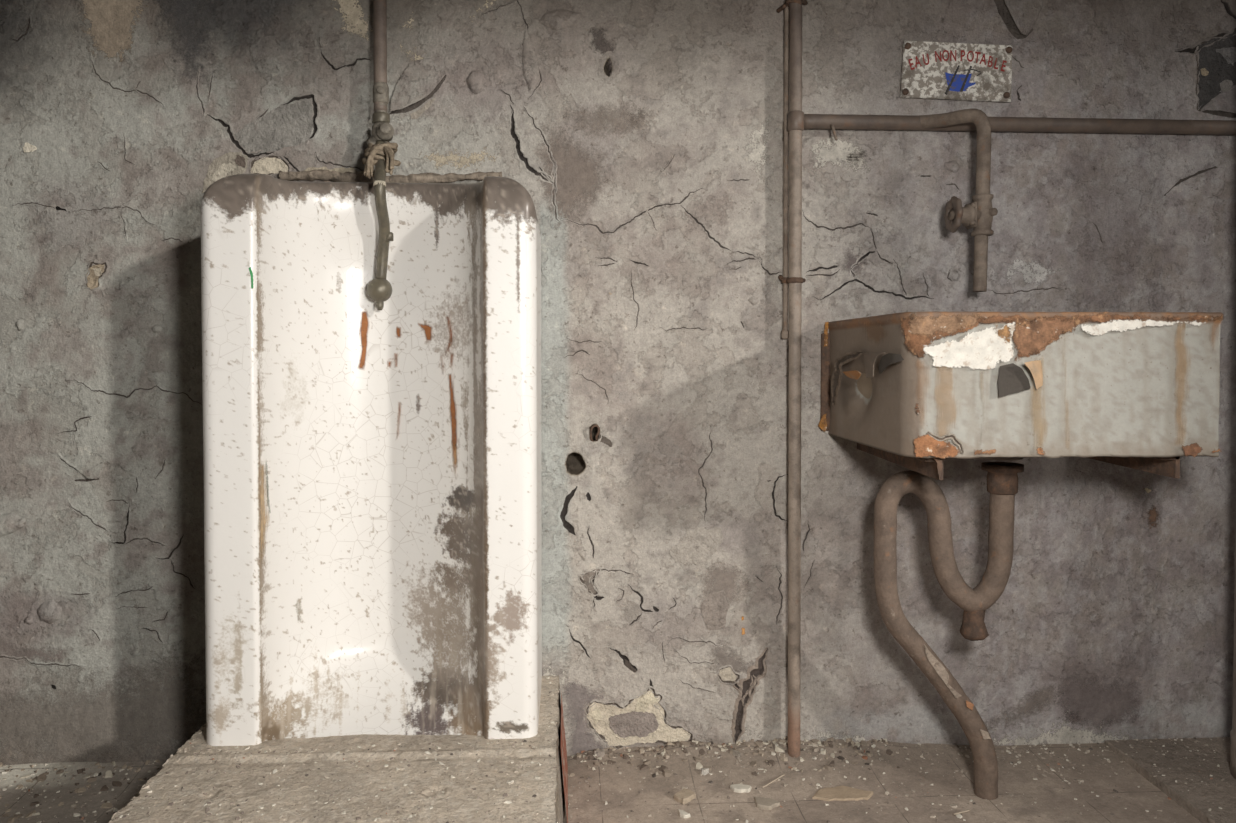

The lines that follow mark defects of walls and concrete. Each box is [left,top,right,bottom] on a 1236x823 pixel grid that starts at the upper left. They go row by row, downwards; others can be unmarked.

peeling [78,0,148,62]
peeling [331,0,373,41]
crack [1012,55,1024,102]
flaking render [1193,29,1236,118]
crack [481,0,953,333]
crack [920,174,960,191]
crack [987,286,1064,296]
crack [563,337,610,403]
crack [557,473,816,743]
flaking render [585,686,694,750]